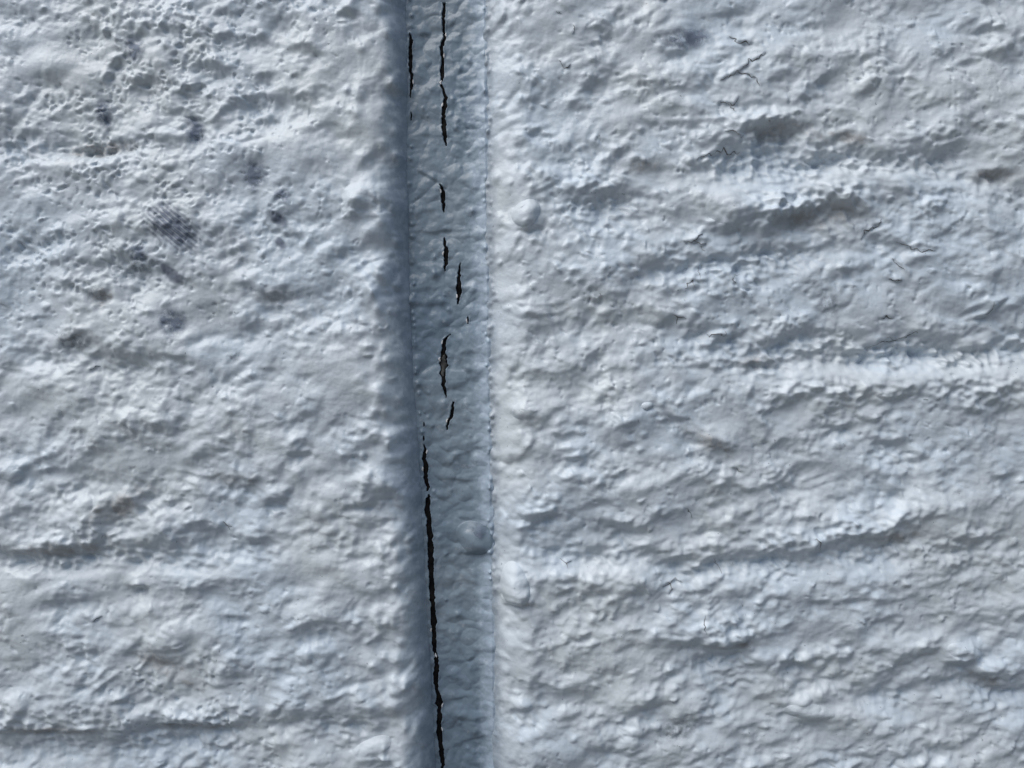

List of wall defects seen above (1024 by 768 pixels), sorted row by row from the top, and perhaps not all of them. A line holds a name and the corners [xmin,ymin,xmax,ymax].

crack [407,33,415,120]
crack [439,3,448,146]
crack [698,36,764,158]
crack [438,184,446,212]
crack [422,238,469,768]